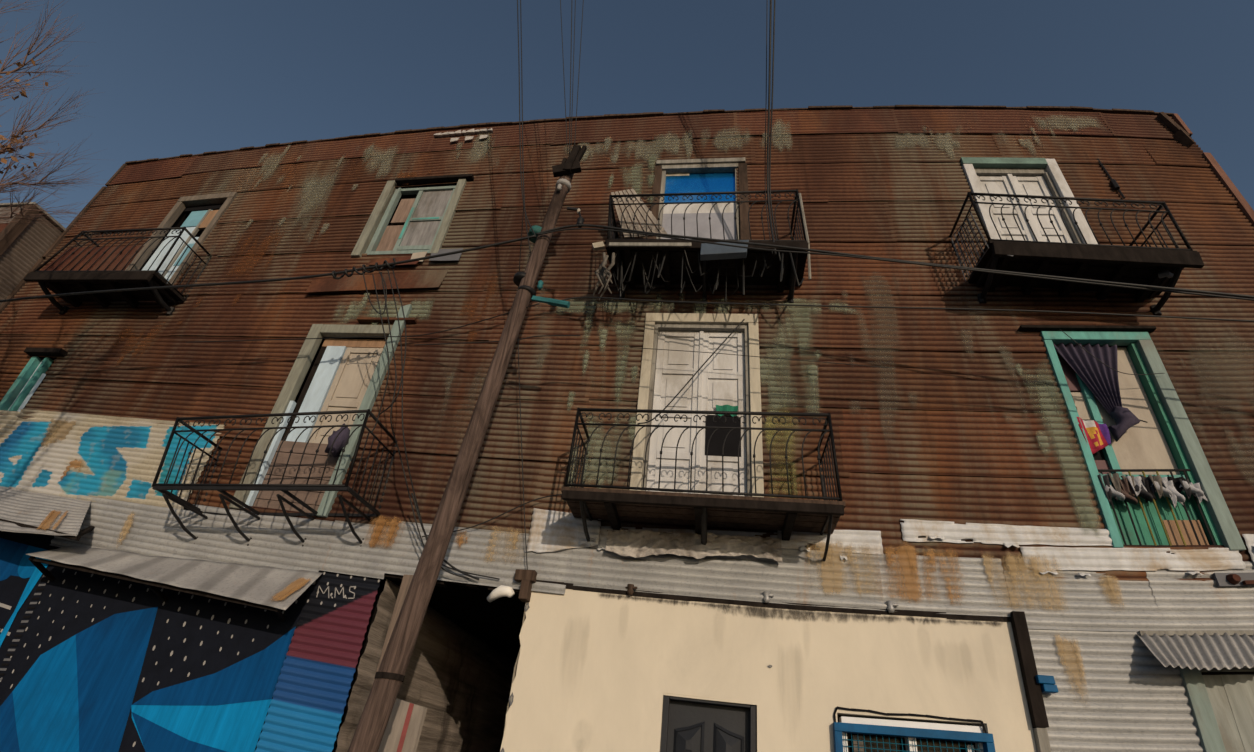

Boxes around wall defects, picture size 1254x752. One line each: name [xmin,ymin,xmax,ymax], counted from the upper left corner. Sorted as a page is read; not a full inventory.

corrosion [41,419,75,446]
corrosion [61,459,83,479]
damp [601,593,956,623]
corrosion [807,542,874,594]
corrosion [886,546,960,603]
corrosion [983,555,1062,609]